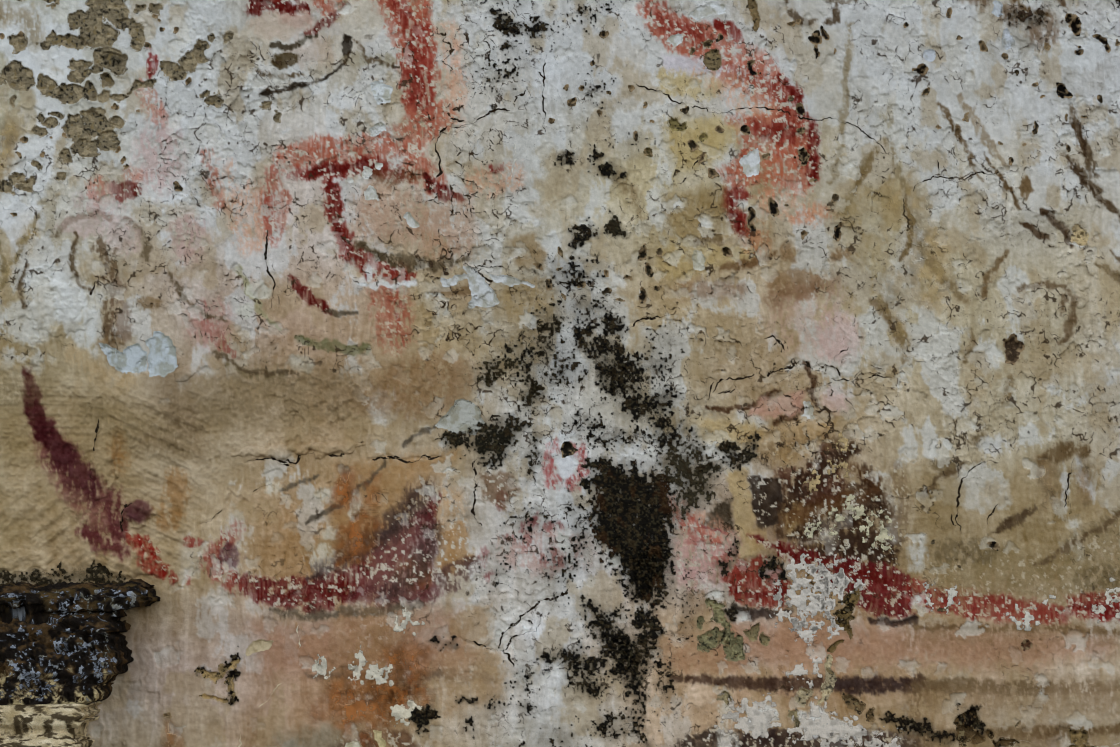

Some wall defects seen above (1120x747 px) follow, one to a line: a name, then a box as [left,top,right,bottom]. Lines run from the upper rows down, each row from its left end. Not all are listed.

spalling [0,0,234,196]
crack [431,0,494,70]
crack [0,135,100,359]
peeling [99,331,178,378]
crack [90,35,613,708]
crack [617,23,1120,616]
damp [441,209,761,747]
crack [593,632,748,747]
peeling [696,553,902,747]
peeling [804,494,894,552]
peeling [923,582,960,614]
peeling [1006,595,1056,651]